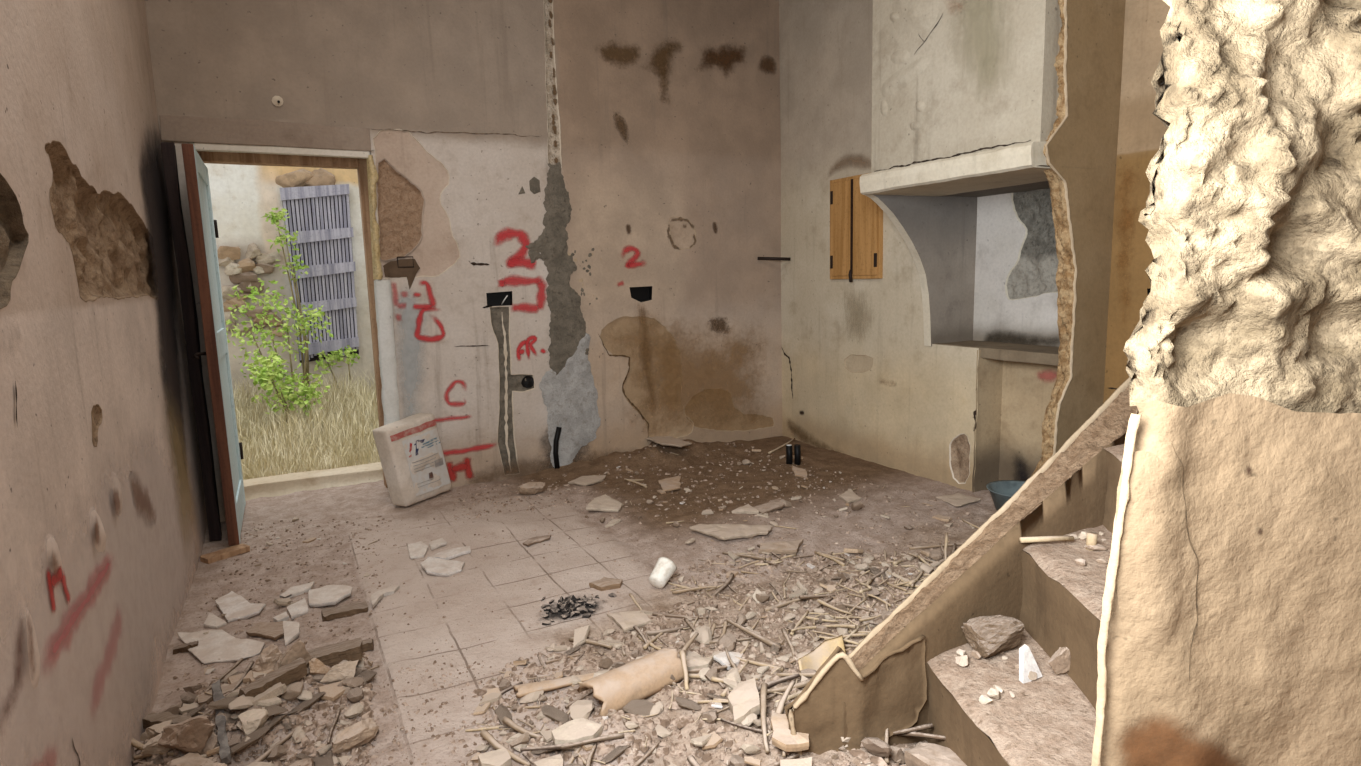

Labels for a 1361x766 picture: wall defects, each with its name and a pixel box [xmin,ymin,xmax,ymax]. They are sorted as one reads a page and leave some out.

leakage [601,43,679,90]
leakage [704,47,743,71]
leakage [760,58,775,72]
spalling [0,173,29,309]
spalling [45,140,158,302]
flaking render [373,129,460,279]
spalling [519,177,541,194]
flaking render [667,217,696,250]
spalling [1005,0,1077,476]
leakage [635,310,752,411]
spalling [949,433,970,484]
crack [1172,444,1199,679]